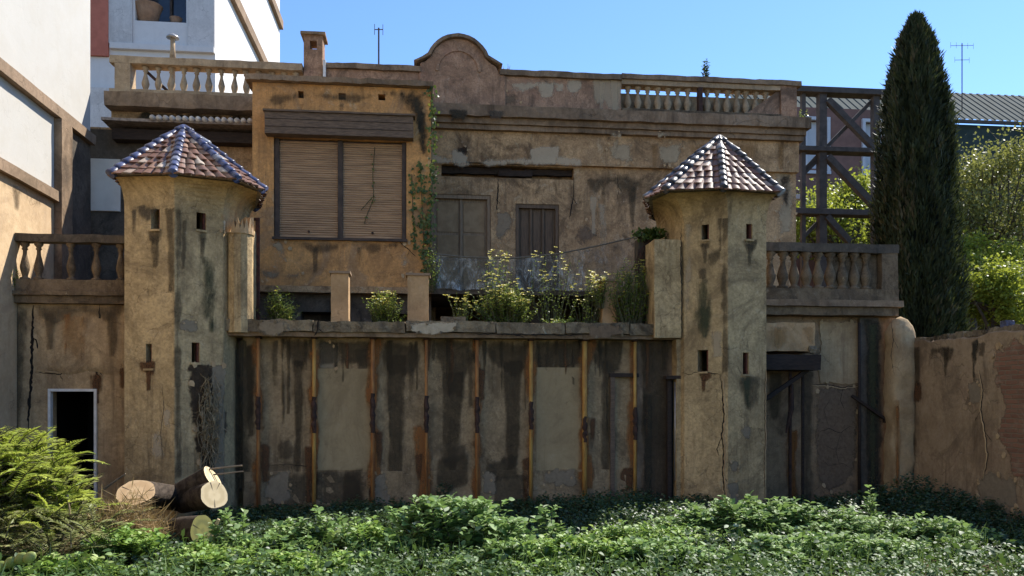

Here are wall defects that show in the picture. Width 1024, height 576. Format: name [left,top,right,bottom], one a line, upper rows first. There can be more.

damp [392,92,468,166]
damp [483,147,580,165]
damp [200,233,213,328]
damp [686,218,729,371]
crack [27,305,63,428]
damp [272,339,419,509]
rust [414,426,433,505]
damp [432,340,581,508]
crack [682,367,728,497]
damp [972,339,984,380]
crack [975,370,991,478]
flaking render [976,320,1024,513]